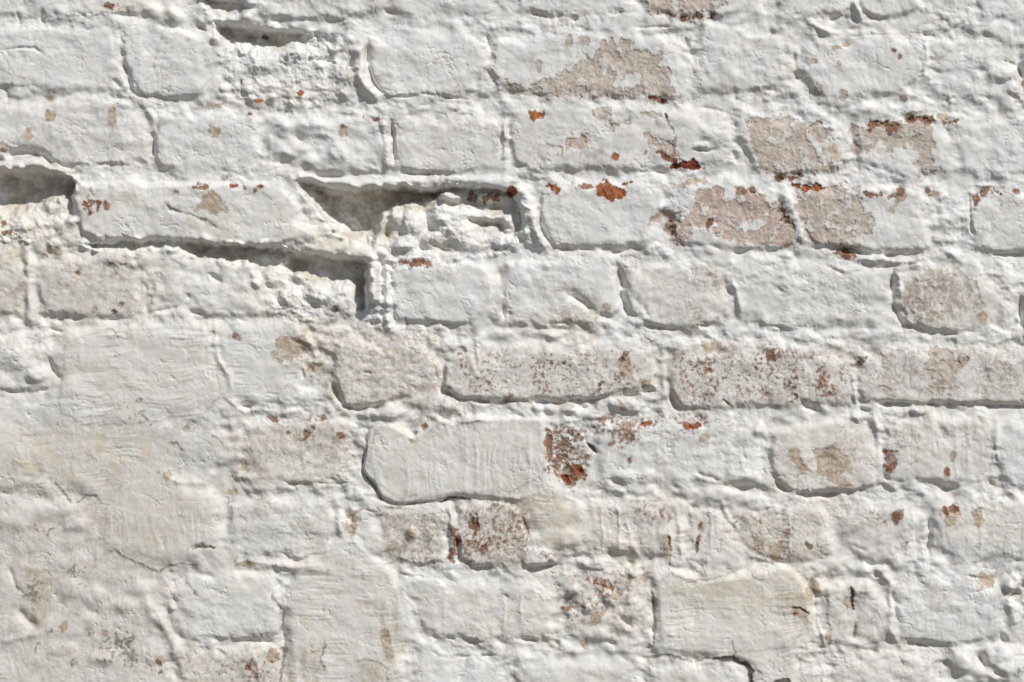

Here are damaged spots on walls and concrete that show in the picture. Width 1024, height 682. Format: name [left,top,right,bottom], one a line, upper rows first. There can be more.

peeling [504,34,675,132]
spalling [578,179,632,202]
peeling [643,94,959,260]
peeling [901,268,987,323]
peeling [857,346,969,397]
peeling [976,347,1017,396]
spalling [543,425,597,486]